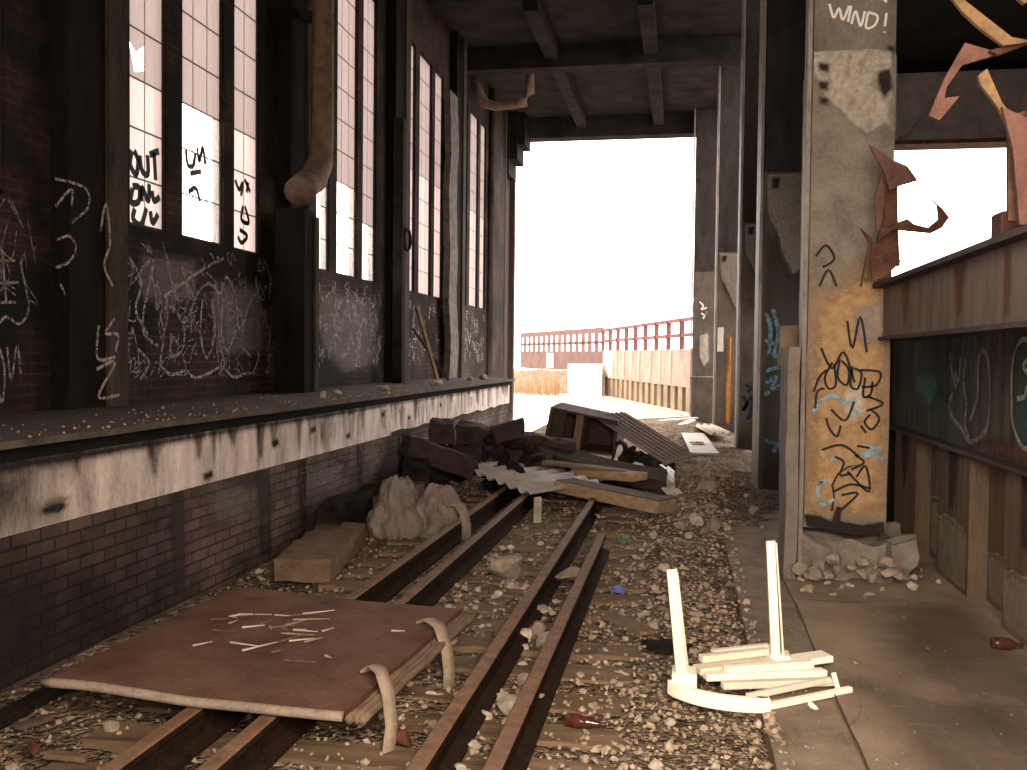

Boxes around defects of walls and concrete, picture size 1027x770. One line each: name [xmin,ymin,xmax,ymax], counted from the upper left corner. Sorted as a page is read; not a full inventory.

spalling [813,46,895,135]
damp [0,385,508,519]
damp [257,469,272,555]
damp [0,549,132,680]